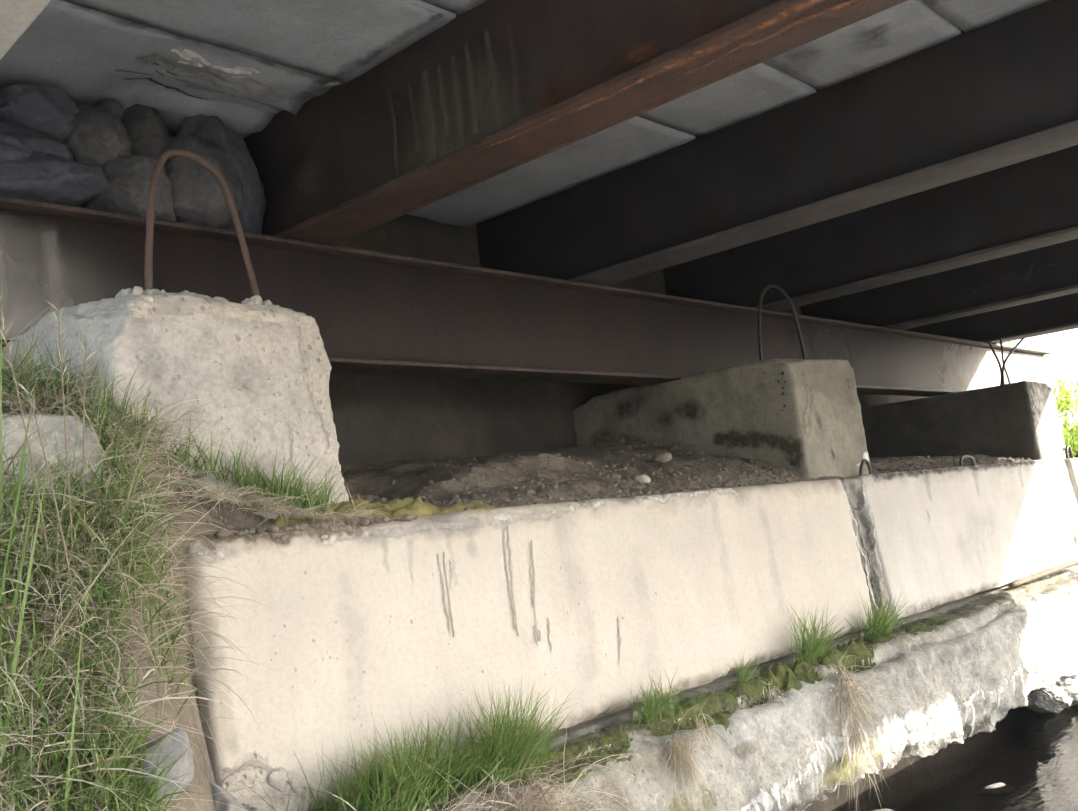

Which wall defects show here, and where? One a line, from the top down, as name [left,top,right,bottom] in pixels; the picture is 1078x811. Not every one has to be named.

peeling [117,54,284,102]
rust [621,0,855,90]
leakage [876,459,1078,480]
crack [437,552,455,637]
crack [503,526,552,651]
leakage [845,483,884,616]
crack [615,618,623,663]
leakage [741,643,1062,811]